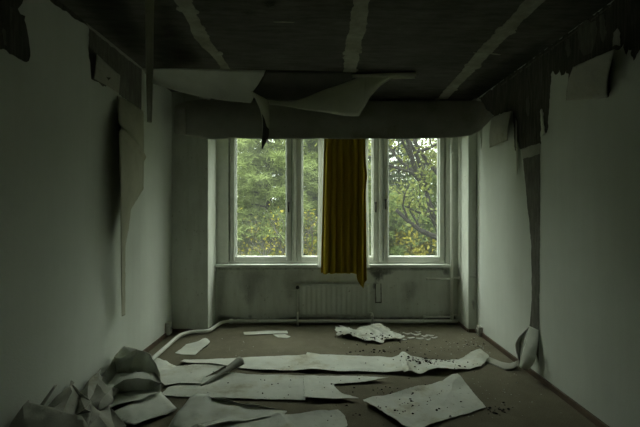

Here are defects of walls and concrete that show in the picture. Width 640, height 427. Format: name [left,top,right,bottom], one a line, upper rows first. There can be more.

flaking render [0,0,30,62]
flaking render [479,0,640,330]